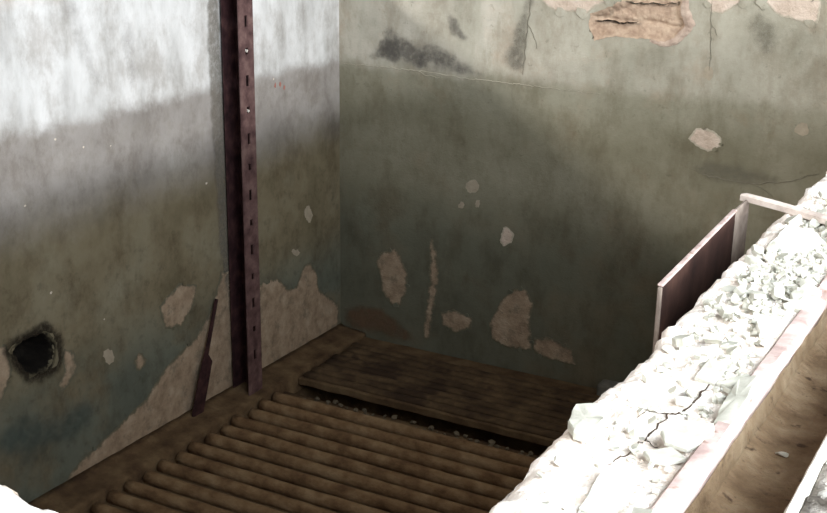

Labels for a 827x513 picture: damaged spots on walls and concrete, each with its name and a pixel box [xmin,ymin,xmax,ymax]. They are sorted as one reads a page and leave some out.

water stain [382,37,466,72]
crack [346,0,591,93]
spalling [542,0,696,47]
peeling [703,0,821,28]
peeling [688,127,722,152]
peeling [703,191,827,338]
peeling [260,262,339,368]
peeling [489,287,578,367]
peeling [66,271,233,481]
peeling [568,403,605,443]
crack [608,379,726,466]
peeling [626,373,759,473]